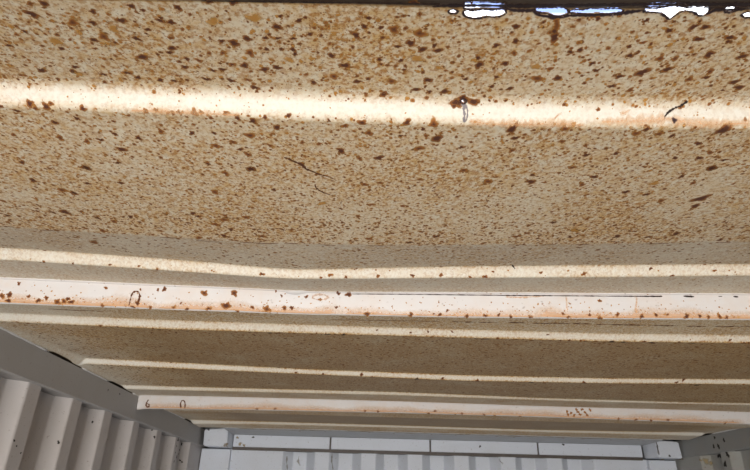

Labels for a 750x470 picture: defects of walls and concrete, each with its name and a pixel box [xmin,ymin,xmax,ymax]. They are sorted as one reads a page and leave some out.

corrosion [67,9,128,42]
corrosion [202,0,750,44]
corrosion [405,28,444,61]
corrosion [218,35,260,90]
corrosion [607,54,679,88]
corrosion [26,99,51,111]
corrosion [440,88,480,109]
crack [664,101,688,117]
corrosion [413,116,443,151]
crack [284,157,337,197]
corrosion [0,288,148,311]
corrosion [160,290,337,320]